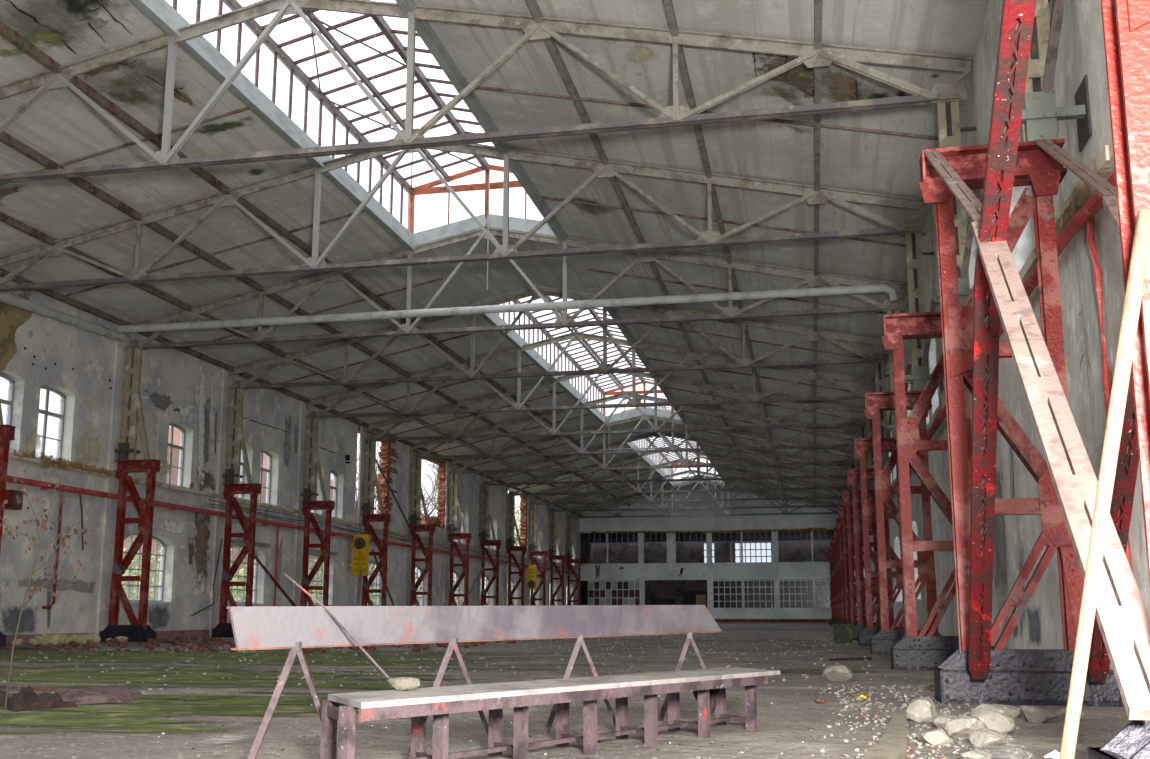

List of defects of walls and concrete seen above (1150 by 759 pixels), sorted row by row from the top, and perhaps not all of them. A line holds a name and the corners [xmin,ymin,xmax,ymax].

crack [6,0,77,55]
water stain [1,0,105,41]
crack [87,4,189,101]
water stain [84,60,193,105]
water stain [756,54,904,103]
water stain [199,118,250,134]
water stain [576,199,609,214]
flaking render [358,427,399,514]
flaking render [413,450,446,529]